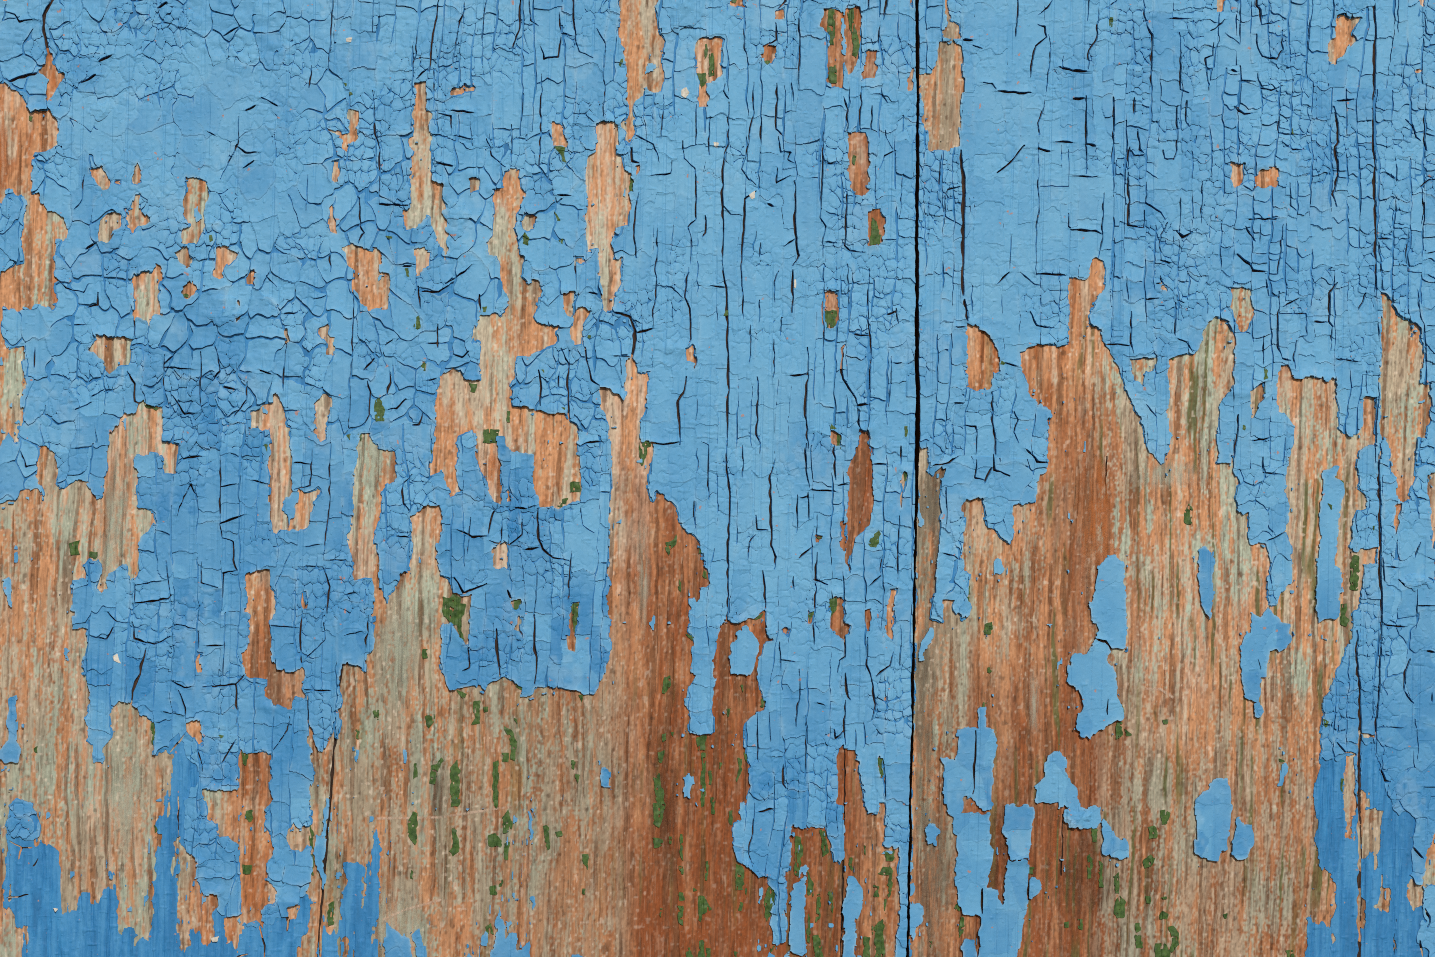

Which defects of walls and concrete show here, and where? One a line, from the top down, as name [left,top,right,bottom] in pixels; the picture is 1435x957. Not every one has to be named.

peeling [0,48,68,446]
crack [85,98,481,428]
peeling [327,82,449,311]
peeling [421,0,665,509]
peeling [846,130,885,246]
peeling [907,0,964,151]
crack [938,0,1310,347]
crack [1237,6,1435,362]
crack [96,456,263,764]
peeling [0,257,1435,957]
crack [538,0,902,957]
crack [1337,454,1434,957]